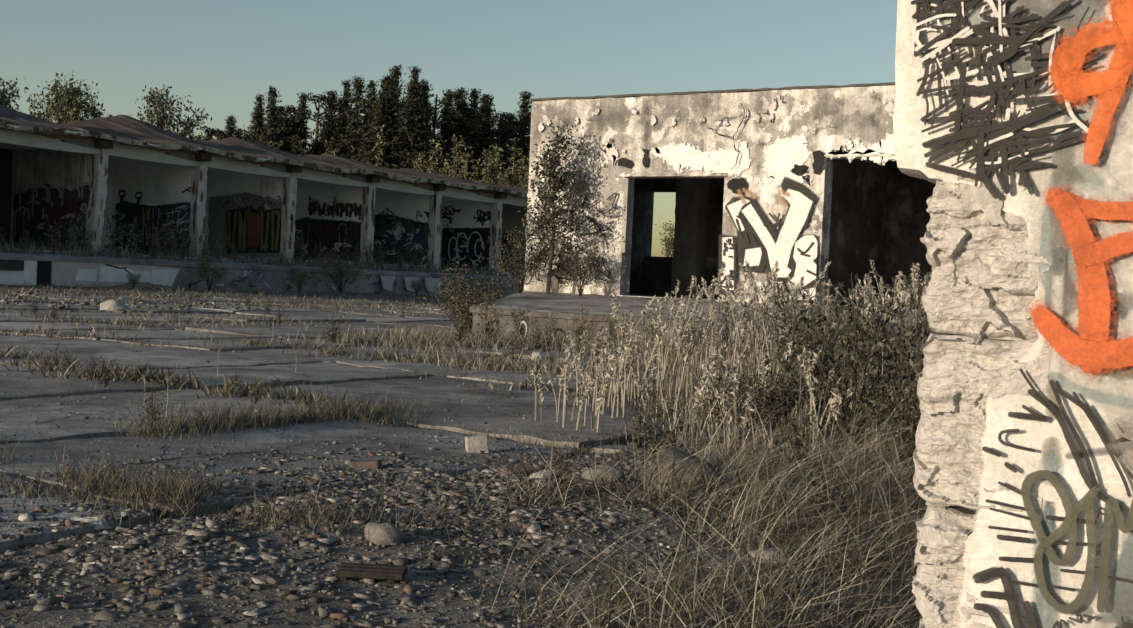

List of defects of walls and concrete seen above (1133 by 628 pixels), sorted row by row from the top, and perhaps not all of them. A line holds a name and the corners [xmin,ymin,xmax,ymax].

peeling [600,138,626,167]
peeling [652,95,815,187]
peeling [828,133,896,165]
spalling [911,168,1055,628]
crack [111,442,312,466]